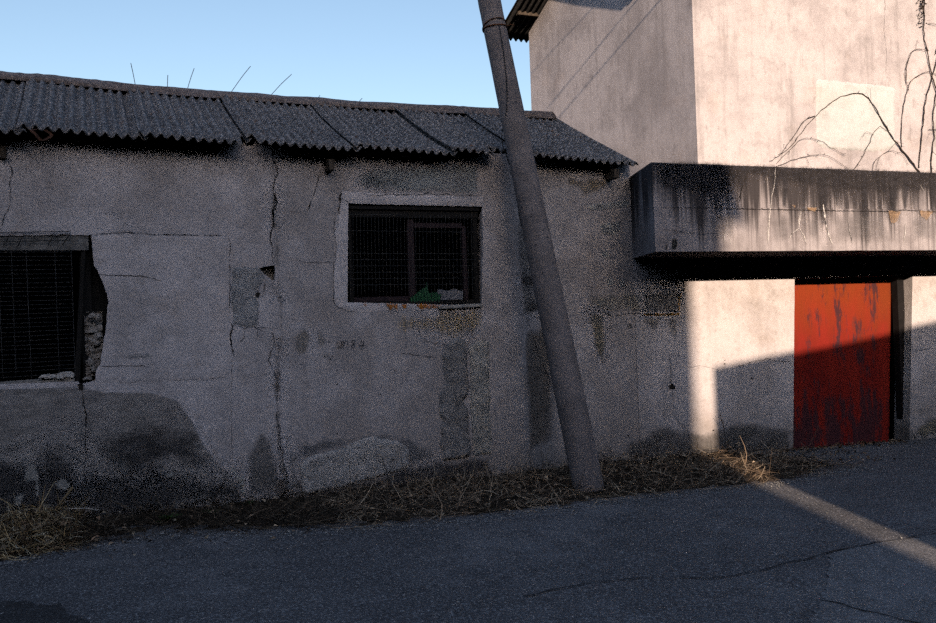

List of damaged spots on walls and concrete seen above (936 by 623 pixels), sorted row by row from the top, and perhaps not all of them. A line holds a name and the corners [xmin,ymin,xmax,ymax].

spalling [77,311,103,390]
crack [92,232,275,389]
spalling [259,266,274,280]
crack [268,151,320,260]
crack [302,181,480,312]
damp [662,162,936,242]
crack [82,390,95,492]
damp [0,388,241,525]
damp [250,438,287,494]